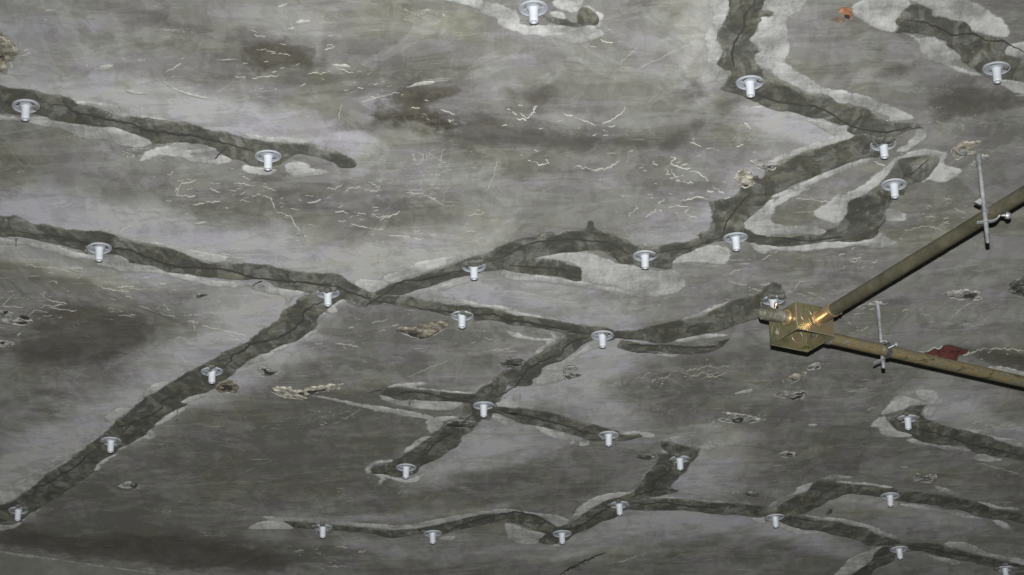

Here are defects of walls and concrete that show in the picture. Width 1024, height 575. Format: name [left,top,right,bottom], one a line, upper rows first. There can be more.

corrosion [839,7,854,20]
spalling [0,32,19,74]
crack [852,0,1024,95]
leakage [354,71,458,129]
crack [0,86,356,178]
crack [375,0,962,297]
spalling [733,159,778,189]
spalling [396,320,449,339]
spalling [215,380,241,393]
spalling [258,366,344,399]
crack [0,216,785,522]
crack [248,435,1024,575]